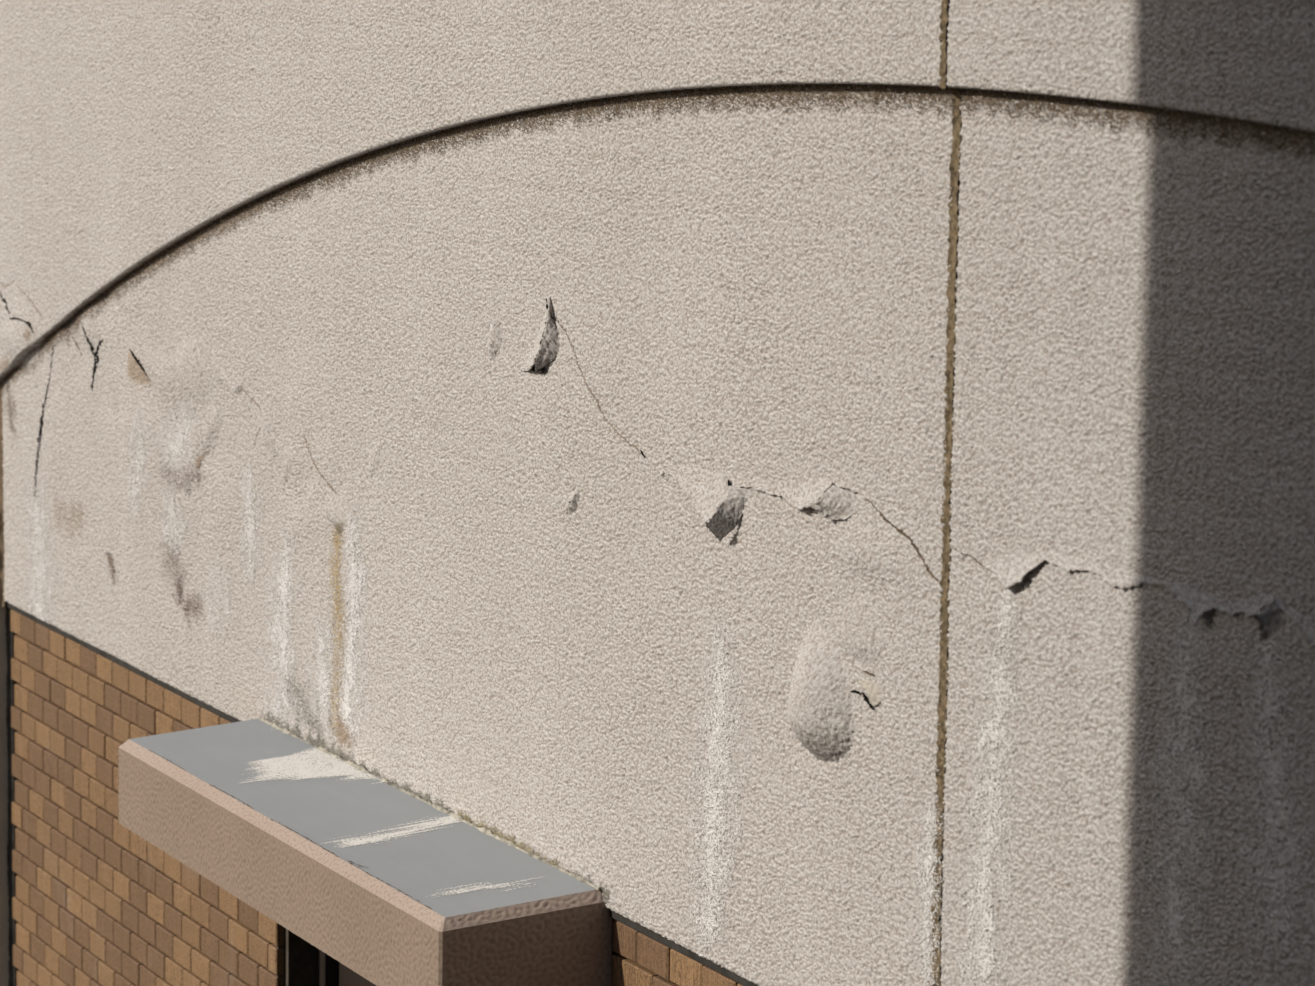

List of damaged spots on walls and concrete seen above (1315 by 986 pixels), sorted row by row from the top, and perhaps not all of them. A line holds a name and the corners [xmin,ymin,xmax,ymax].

crack [0,280,145,497]
peeling [520,297,560,374]
peeling [659,461,871,542]
water stain [125,389,377,755]
peeling [983,541,1315,648]